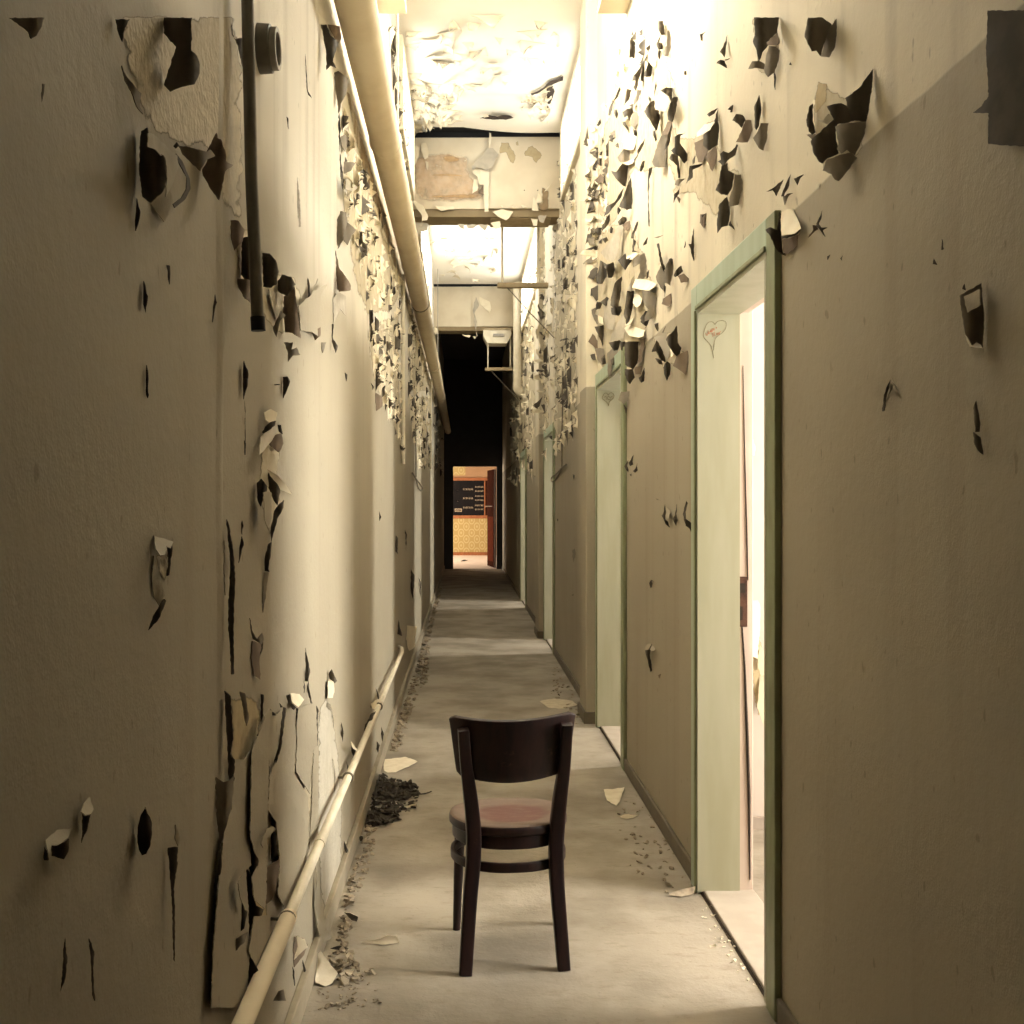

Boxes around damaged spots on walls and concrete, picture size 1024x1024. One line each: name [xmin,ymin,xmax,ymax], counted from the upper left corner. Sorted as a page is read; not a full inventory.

peeling [9,17,44,39]
peeling [388,15,564,178]
peeling [748,17,792,88]
peeling [805,17,837,57]
peeling [806,70,873,189]
peeling [973,10,1024,146]
peeling [115,16,444,476]
peeling [410,20,769,487]
peeling [766,174,826,256]
peeling [960,283,985,349]
peeling [257,409,291,611]
peeling [210,648,358,1008]